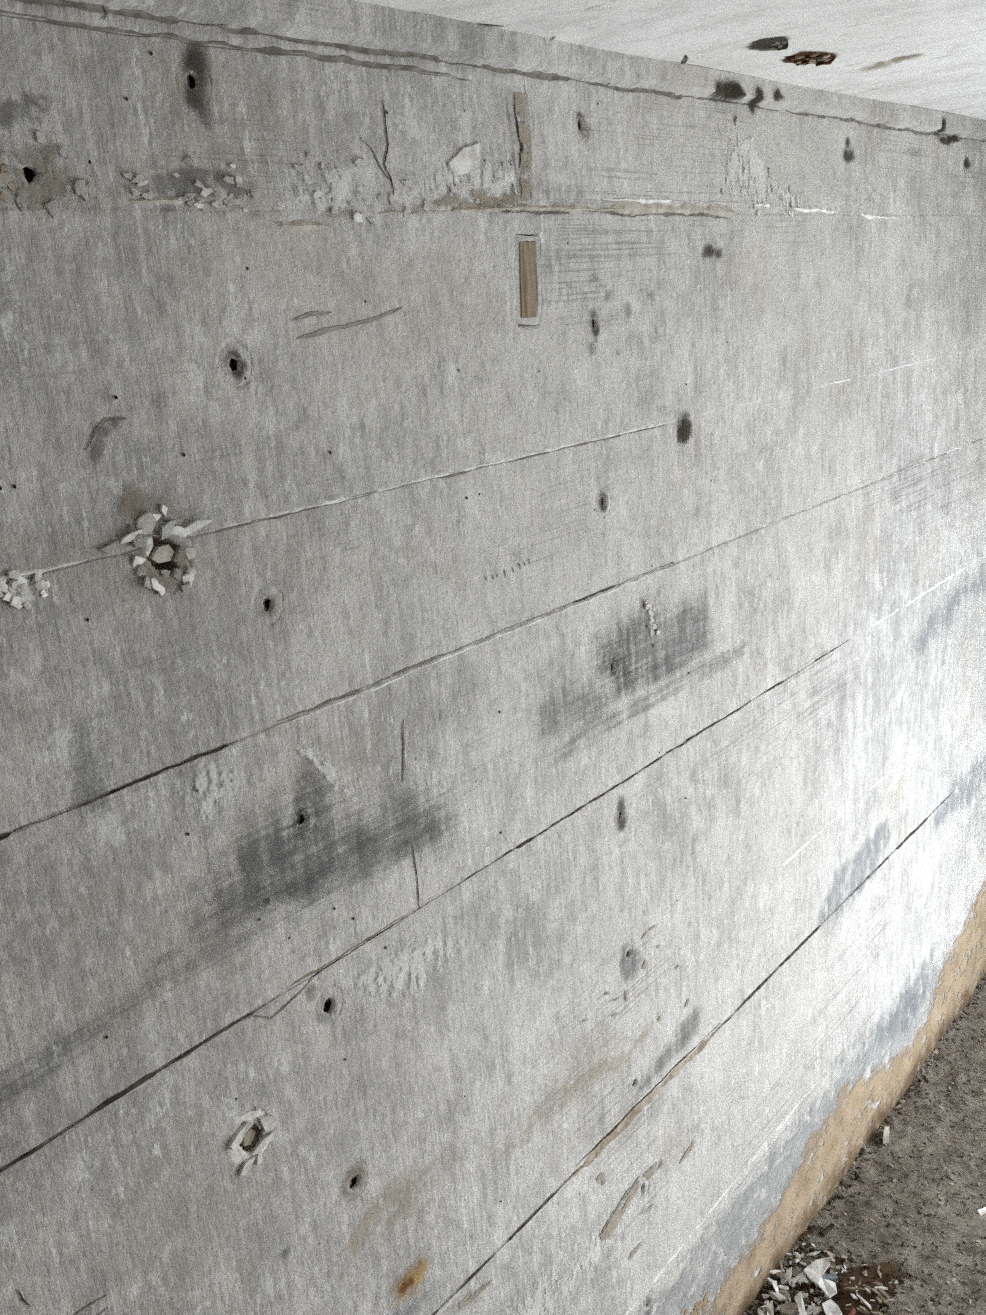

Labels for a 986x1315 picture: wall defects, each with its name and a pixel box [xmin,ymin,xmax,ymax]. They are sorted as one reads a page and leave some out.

spalling [0,95,98,218]
peeling [121,157,256,212]
spalling [98,488,213,596]
spalling [0,569,50,609]
leakage [639,881,986,1315]
spalling [227,1106,277,1176]
corrosion [396,1260,427,1299]